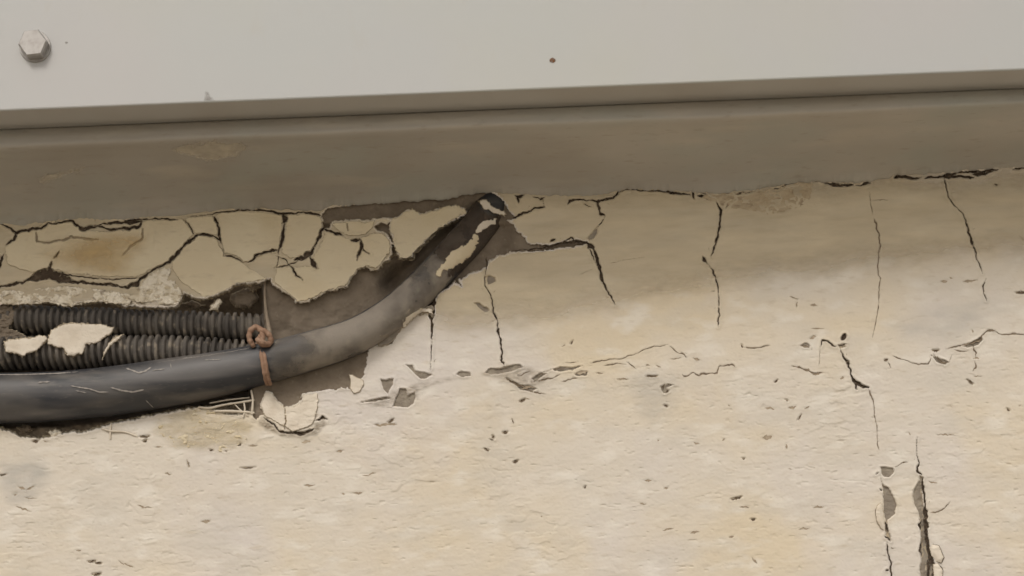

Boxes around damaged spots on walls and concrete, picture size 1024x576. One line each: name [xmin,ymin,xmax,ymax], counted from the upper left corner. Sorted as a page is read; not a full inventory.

crack [0,209,367,289]
flaking render [0,302,435,467]
flaking render [0,193,597,373]
peeling [486,365,602,402]
crack [484,259,770,394]
crack [512,184,787,325]
crack [816,181,881,337]
crack [884,329,1024,370]
crack [895,168,1021,301]
crack [793,334,948,576]
peeling [881,467,896,540]
peeling [913,477,937,576]